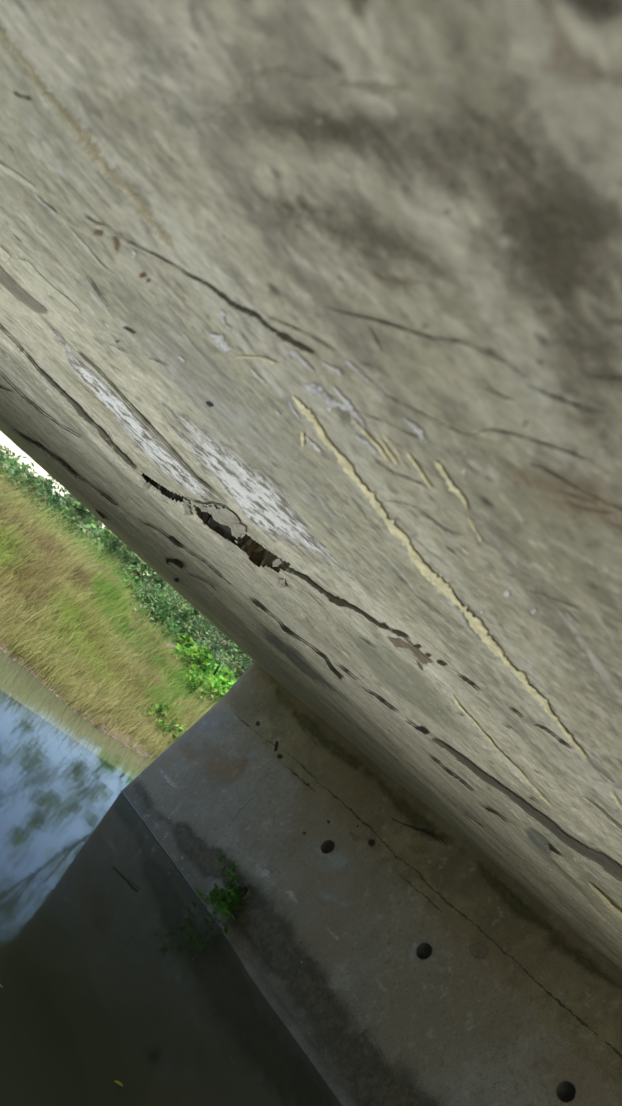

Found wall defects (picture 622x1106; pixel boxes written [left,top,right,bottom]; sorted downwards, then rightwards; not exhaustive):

peeling [0,247,80,313]
crack [10,429,117,505]
crack [0,326,135,471]
crack [75,277,227,505]
peeling [50,327,351,588]
crack [83,216,335,354]
crack [326,307,622,535]
crack [138,522,622,886]
leakage [160,817,436,1106]
crack [241,720,622,1058]